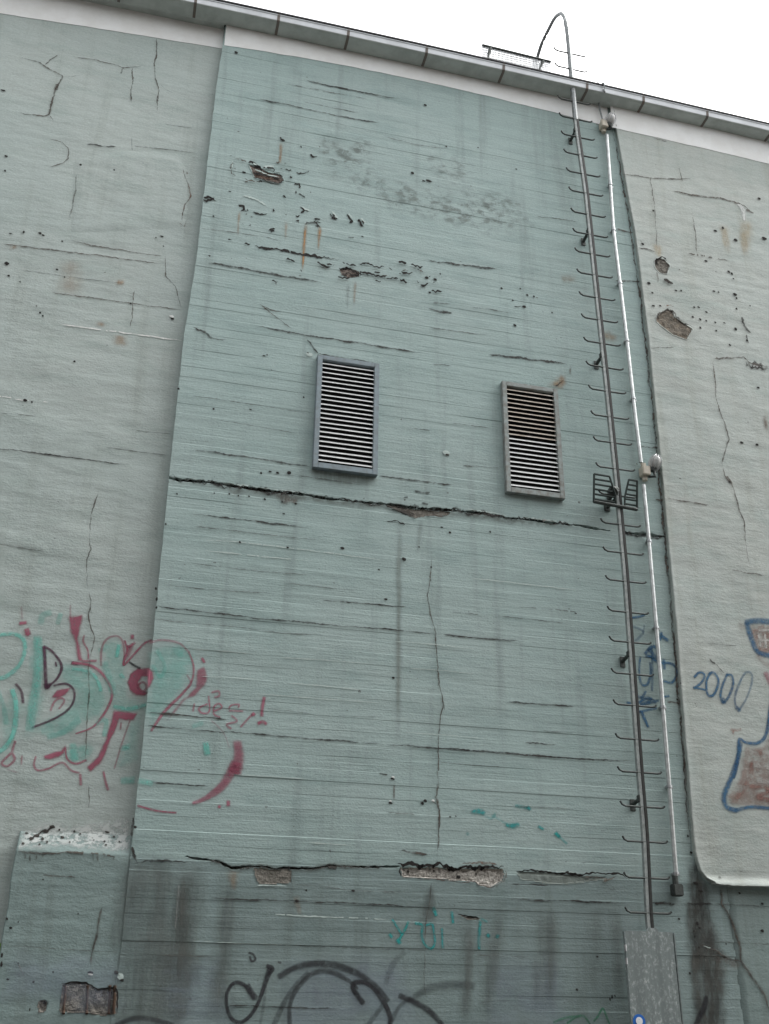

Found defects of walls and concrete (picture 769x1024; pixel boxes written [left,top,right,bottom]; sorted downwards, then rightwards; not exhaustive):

crack [21,39,192,227]
spalling [230,155,366,238]
spalling [317,261,442,293]
spalling [647,256,737,340]
crack [176,450,593,529]
crack [713,366,762,576]
crack [147,560,626,855]
peeling [19,821,128,861]
crack [131,818,431,989]
spalling [398,861,628,888]
water stain [688,865,723,1024]
spalling [59,971,124,1016]